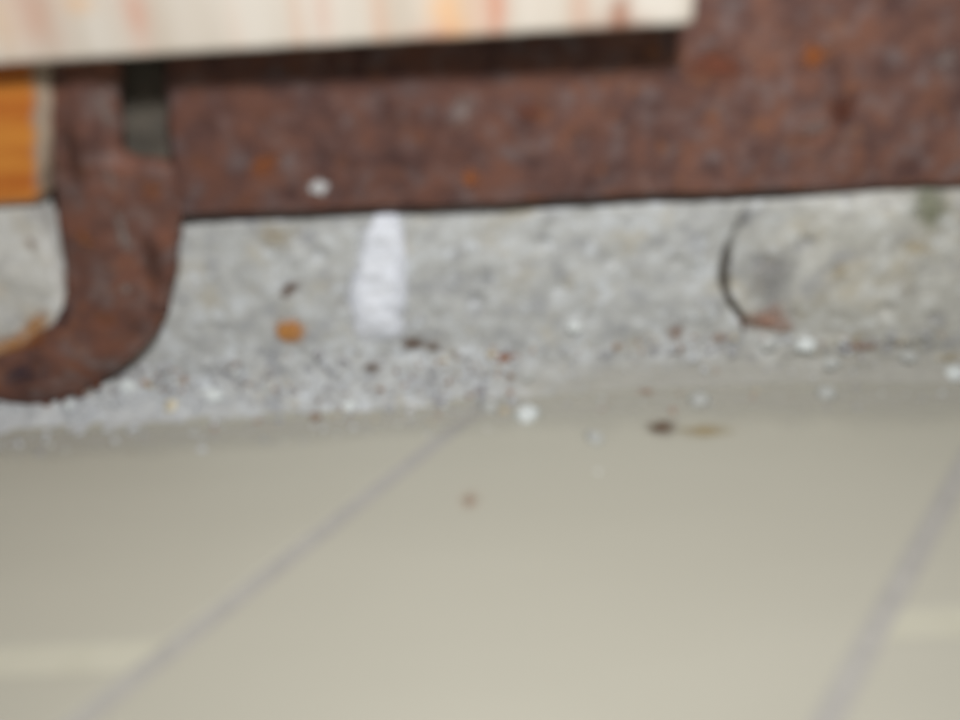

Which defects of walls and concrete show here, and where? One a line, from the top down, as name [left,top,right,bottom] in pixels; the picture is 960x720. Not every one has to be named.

water stain [348,208,406,338]
crack [719,244,767,330]
corrosion [277,321,302,342]
corrosion [405,339,437,350]
corrosion [651,422,670,432]